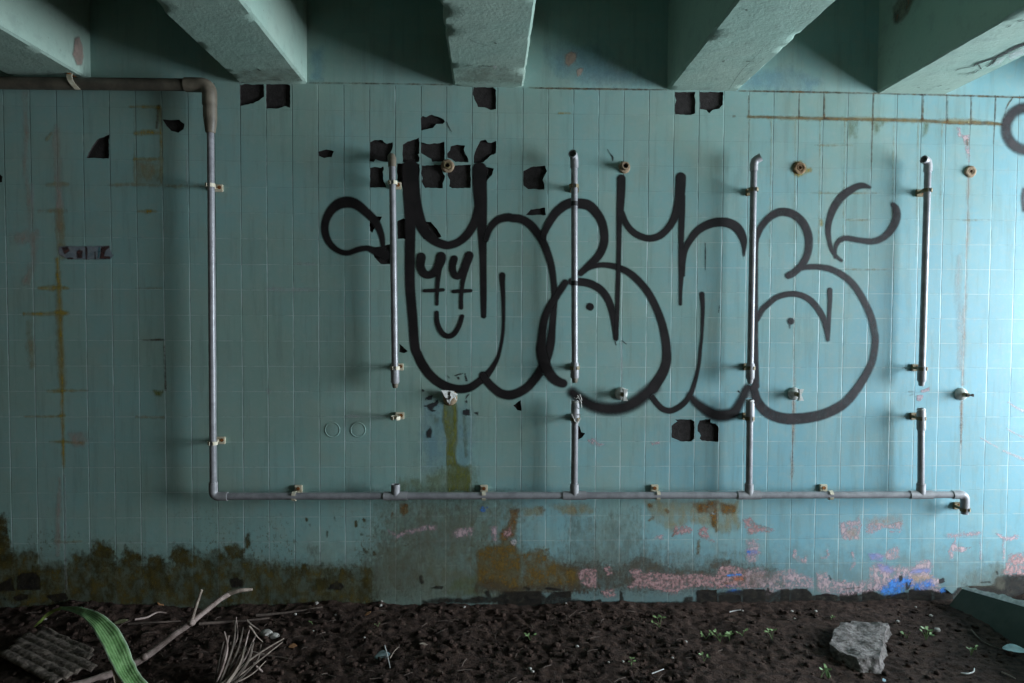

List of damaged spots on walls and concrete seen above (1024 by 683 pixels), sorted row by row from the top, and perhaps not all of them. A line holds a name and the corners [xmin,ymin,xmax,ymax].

peeling [240,69,290,109]
peeling [473,79,500,110]
peeling [675,92,723,115]
spalling [87,135,109,159]
spalling [370,115,496,188]
peeling [523,166,547,190]
damp [0,76,970,515]
corrosion [23,191,82,461]
peeling [671,419,719,442]
corrosion [648,501,737,537]
corrosion [475,509,589,593]
peeling [570,518,1024,607]